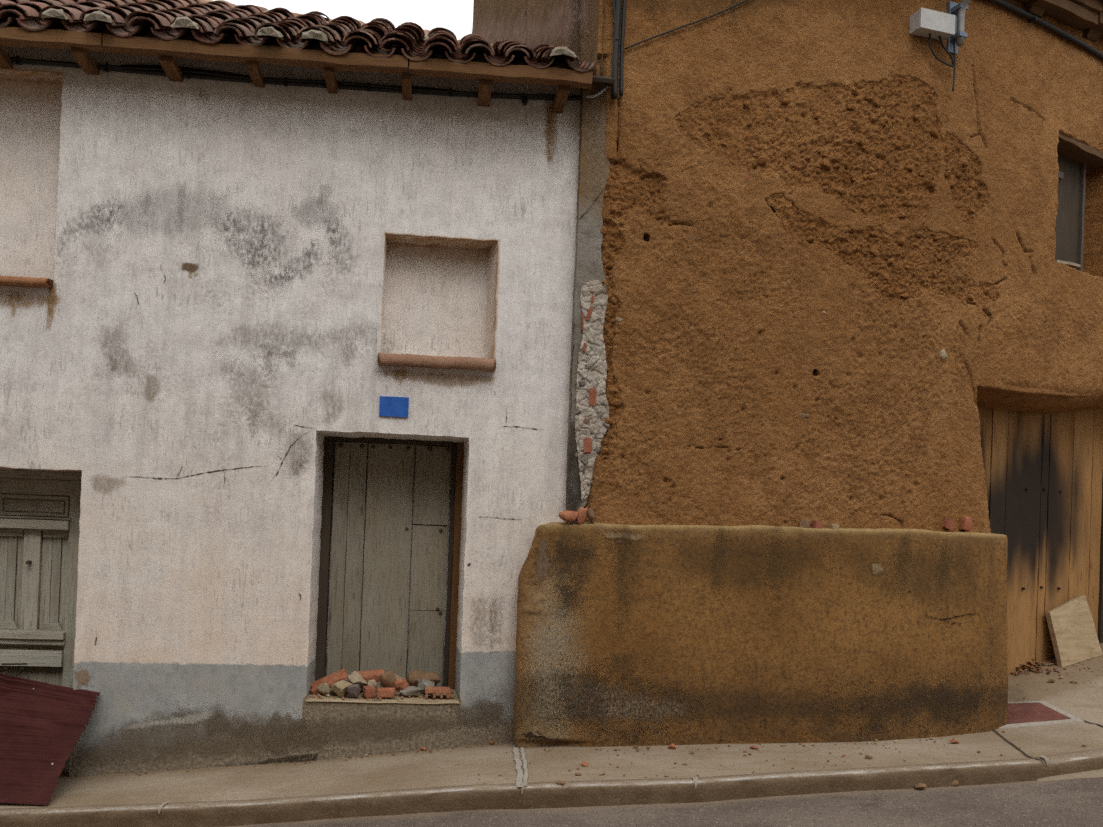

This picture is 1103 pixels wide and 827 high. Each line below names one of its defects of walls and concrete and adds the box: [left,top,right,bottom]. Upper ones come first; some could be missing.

spalling [574,262,615,501]
crack [137,425,314,487]
water stain [83,702,502,762]